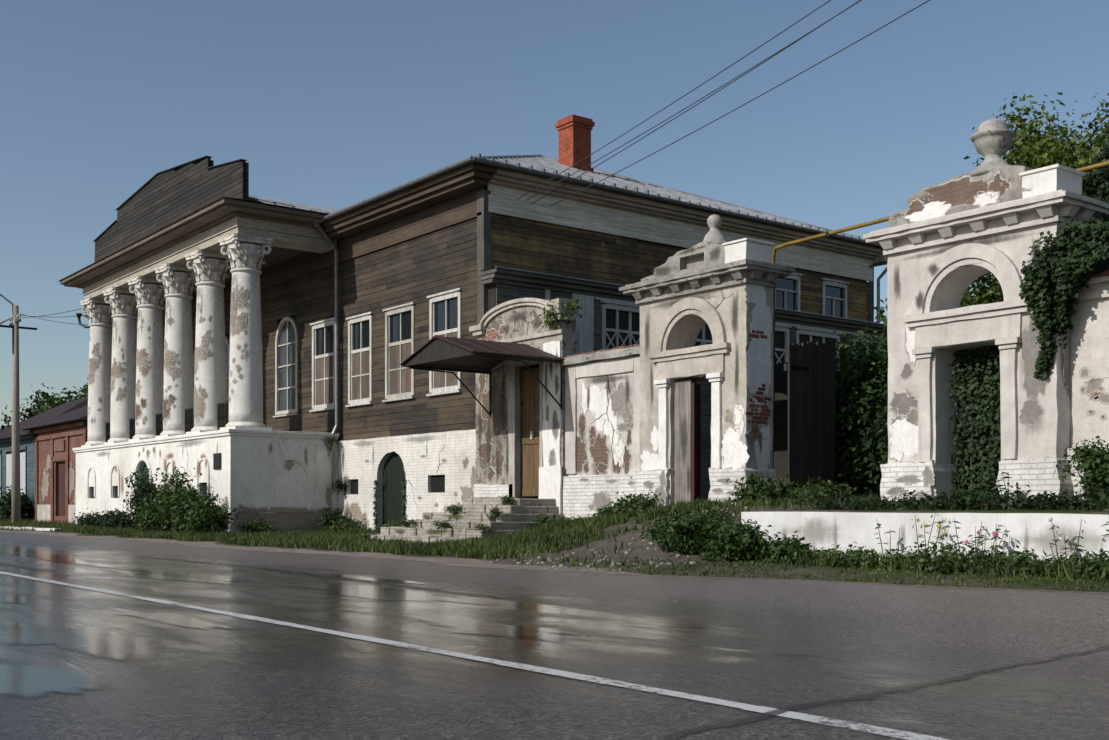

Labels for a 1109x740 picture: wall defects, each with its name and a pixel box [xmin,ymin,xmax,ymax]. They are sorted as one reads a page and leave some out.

spalling [905,171,1012,222]
peeling [87,318,151,434]
peeling [163,339,182,425]
spalling [194,301,214,420]
peeling [229,286,250,403]
peeling [577,378,667,512]
peeling [712,283,772,496]
peeling [888,323,918,462]
spalling [886,465,935,500]
peeling [1018,301,1109,426]